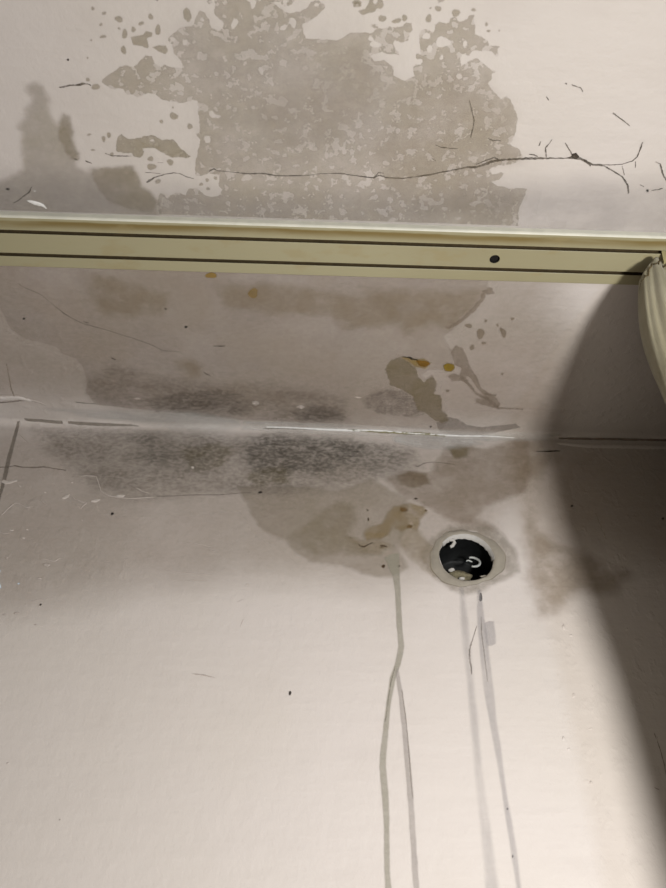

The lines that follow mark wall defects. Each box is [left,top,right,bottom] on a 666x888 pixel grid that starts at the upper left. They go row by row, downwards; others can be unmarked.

leakage [122,22,167,51]
leakage [104,134,190,169]
crack [209,101,666,194]
leakage [387,359,495,435]
leakage [450,320,503,409]
leakage [384,554,403,730]
leakage [380,753,389,833]